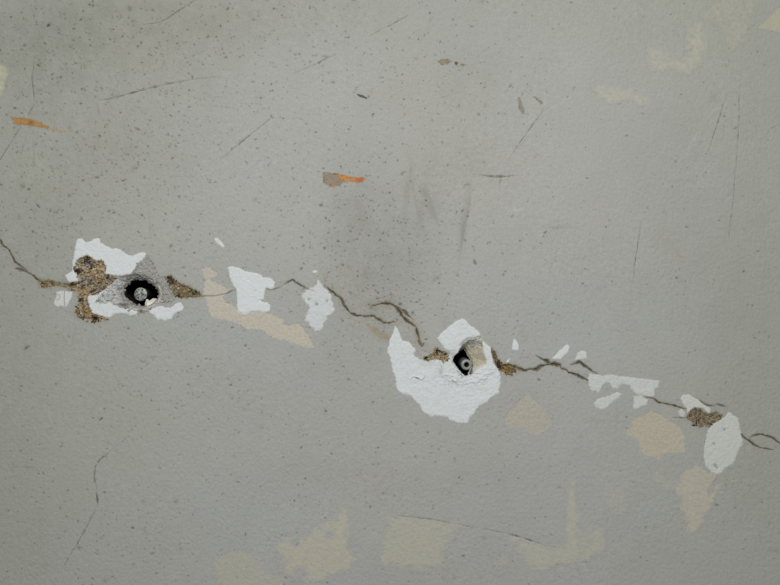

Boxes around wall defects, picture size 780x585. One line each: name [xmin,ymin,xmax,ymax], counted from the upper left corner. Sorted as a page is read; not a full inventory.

rust [10,116,71,133]
rust [322,171,367,188]
crack [0,229,41,282]
peeling [39,238,335,347]
crack [265,279,428,347]
peeling [387,318,519,423]
crack [514,355,598,381]
flaking render [588,373,743,474]
crack [646,397,726,419]
crack [741,433,780,450]